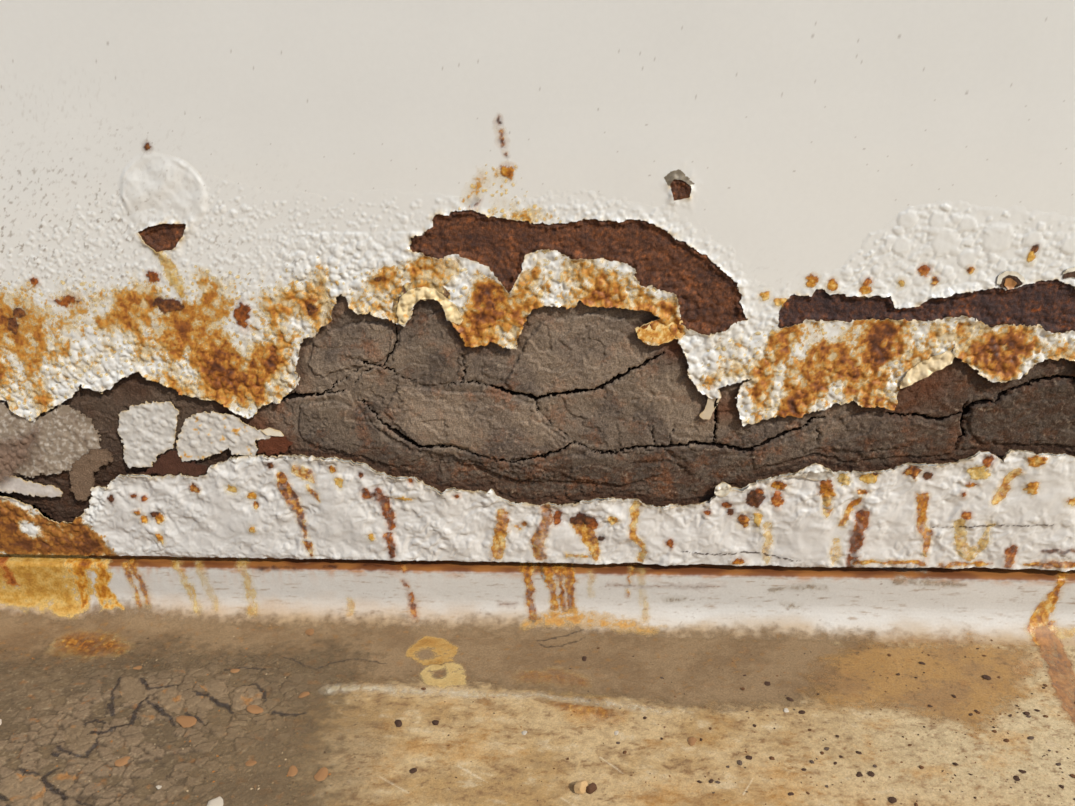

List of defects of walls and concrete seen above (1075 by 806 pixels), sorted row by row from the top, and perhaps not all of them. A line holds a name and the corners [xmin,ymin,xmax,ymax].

corrosion [0,250,685,421]
peeling [0,210,1075,522]
crack [283,323,825,474]
corrosion [700,317,1075,423]
crack [886,374,1075,444]
corrosion [0,500,148,618]
corrosion [267,462,320,557]
corrosion [358,472,417,617]
corrosion [491,500,654,633]
corrosion [704,481,787,546]
corrosion [819,472,933,583]
corrosion [1005,545,1075,723]